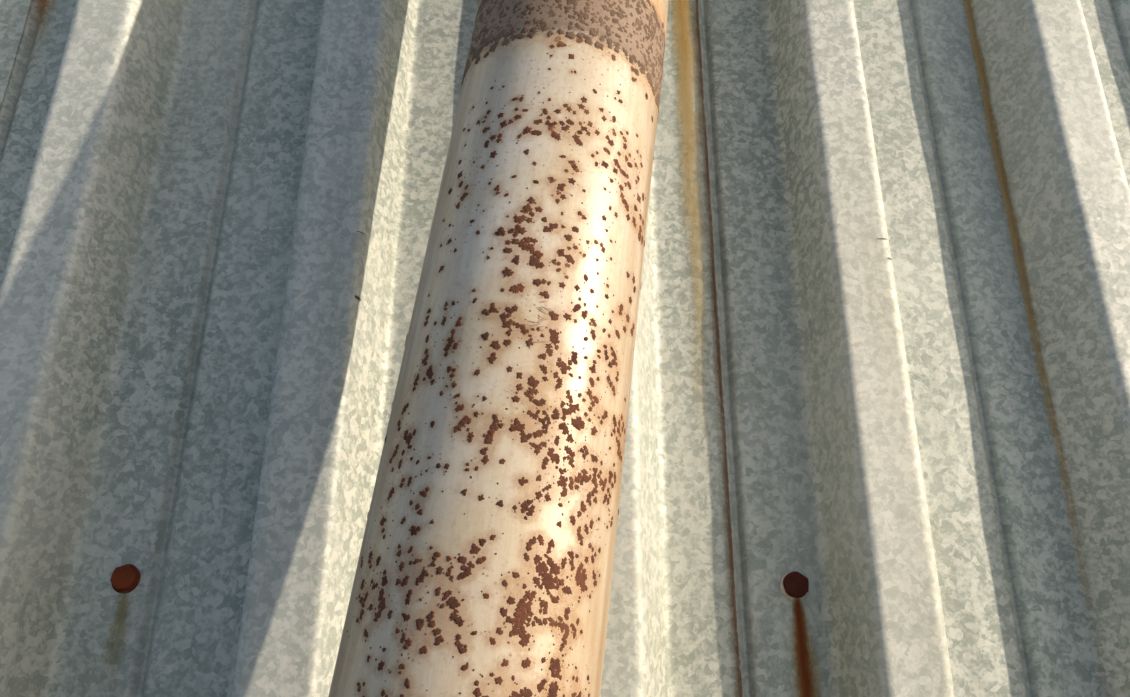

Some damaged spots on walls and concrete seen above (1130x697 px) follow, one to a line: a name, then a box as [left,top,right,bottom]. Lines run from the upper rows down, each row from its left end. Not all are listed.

rust [347,0,743,697]
rust [964,0,1074,525]
rust [793,598,819,697]